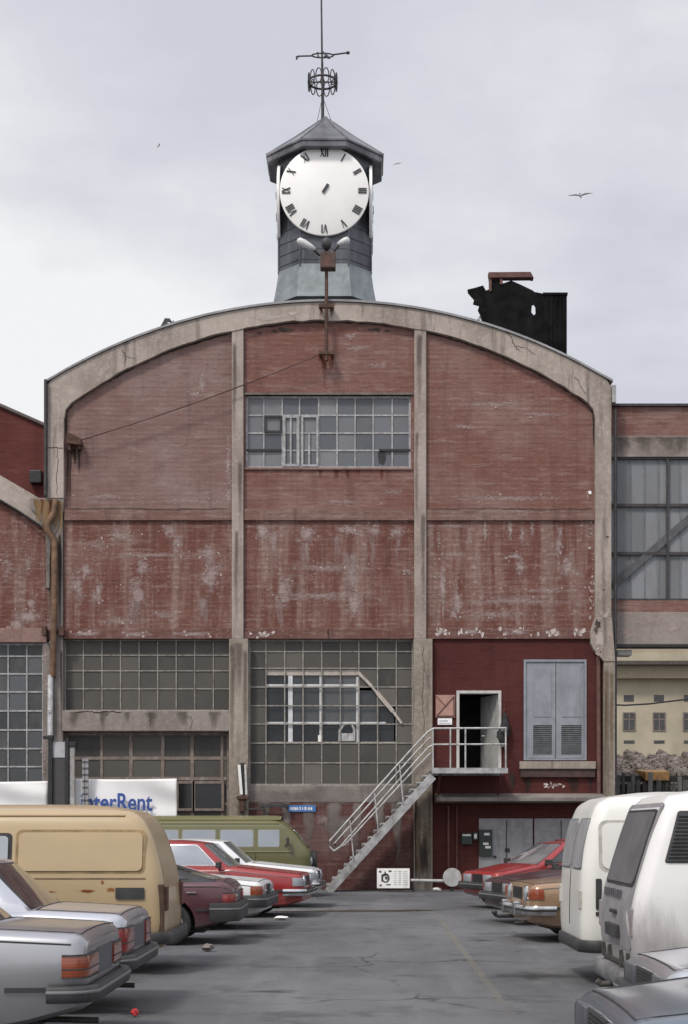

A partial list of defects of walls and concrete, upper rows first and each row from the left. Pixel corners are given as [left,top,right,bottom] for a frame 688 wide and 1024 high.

crack [48,321,594,519]
peeling [429,543,484,637]
peeling [488,617,559,637]
spalling [574,521,608,655]